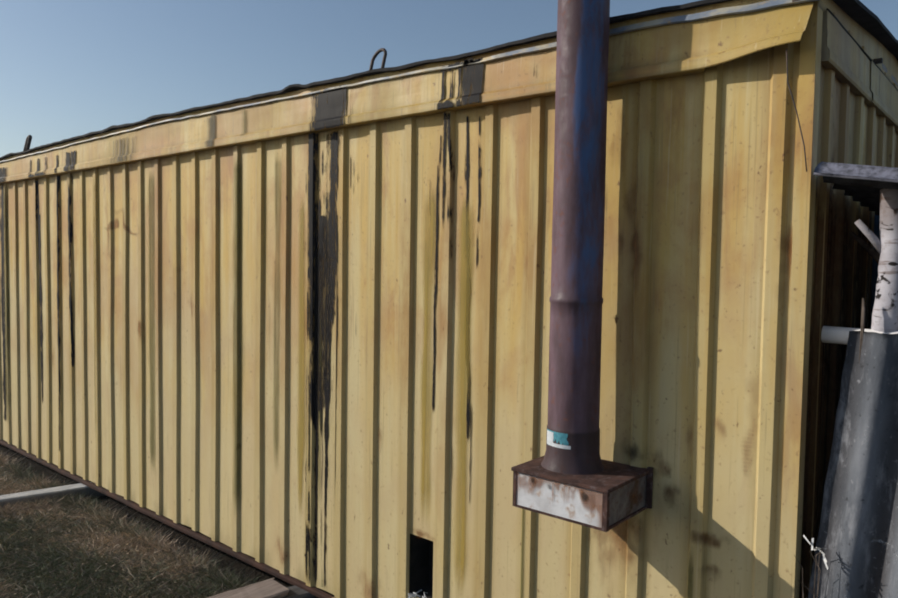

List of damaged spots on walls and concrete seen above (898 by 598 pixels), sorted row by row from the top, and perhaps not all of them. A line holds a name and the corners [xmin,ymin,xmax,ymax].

damp [0,185,9,418]
damp [28,158,47,401]
damp [56,176,75,393]
damp [305,131,339,586]
damp [429,58,481,502]
corrosion [517,473,603,523]